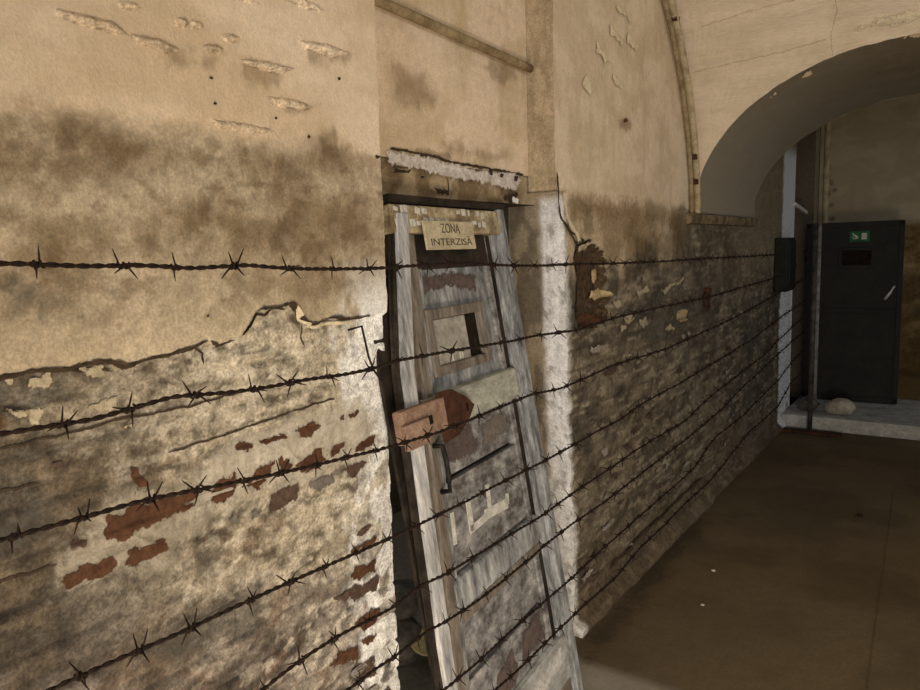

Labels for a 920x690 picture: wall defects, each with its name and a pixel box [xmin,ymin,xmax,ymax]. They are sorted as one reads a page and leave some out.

flaking render [573,239,649,332]
peeling [665,309,691,339]
peeling [28,372,53,389]
peeling [79,364,105,378]
peeling [6,407,44,426]
flaking render [55,396,380,592]
flaking render [333,559,380,603]
flaking render [329,608,391,690]